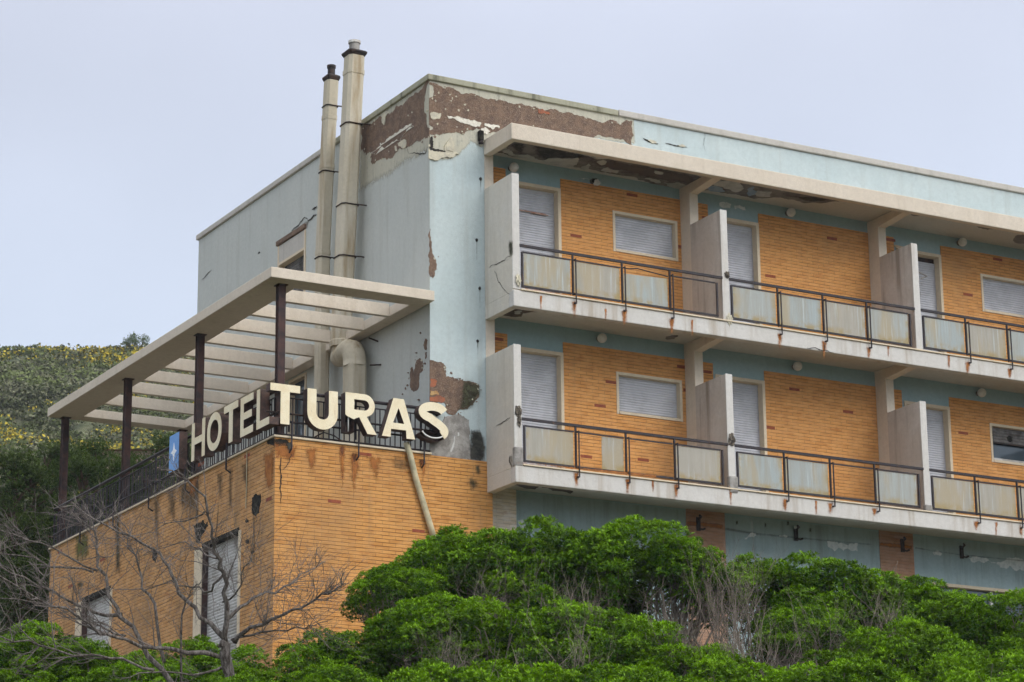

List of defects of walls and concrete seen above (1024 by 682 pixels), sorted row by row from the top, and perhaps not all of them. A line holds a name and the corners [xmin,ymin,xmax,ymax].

spalling [360,80,635,188]
peeling [498,142,839,210]
flaking render [428,231,439,278]
rust [525,288,627,323]
spalling [401,332,480,460]